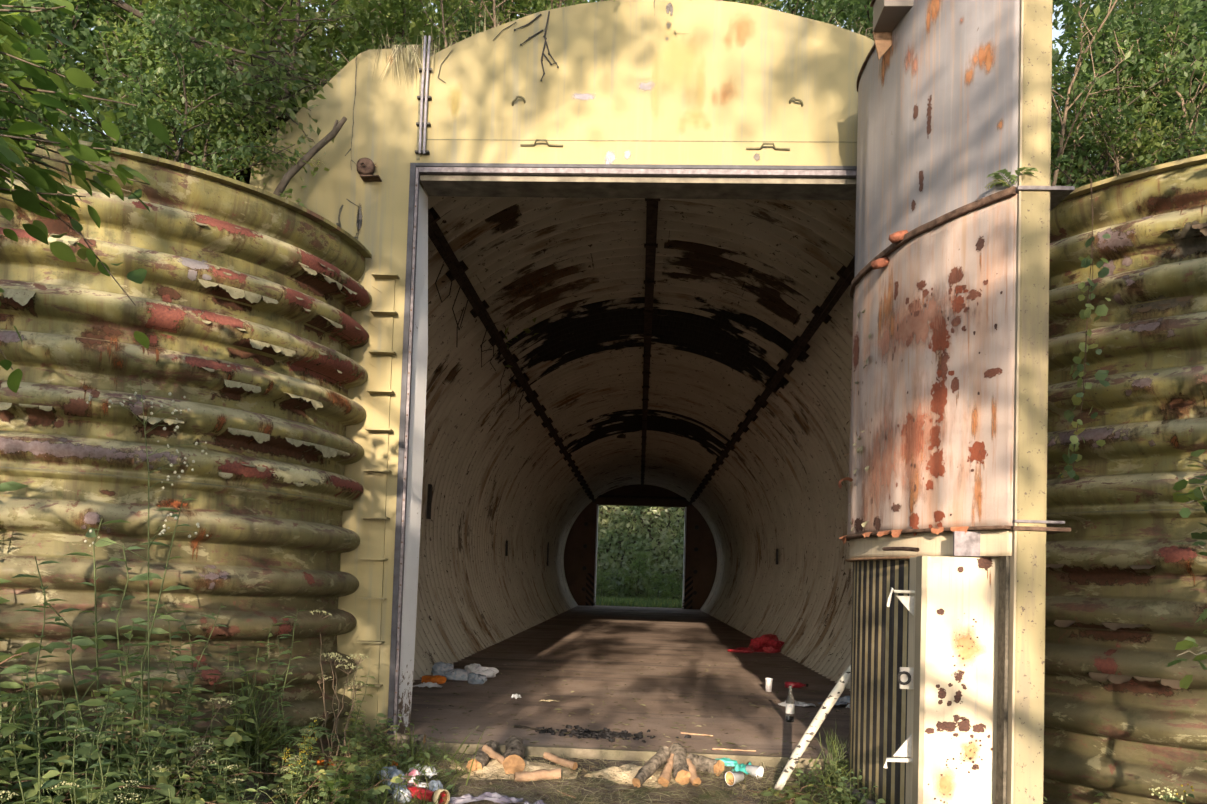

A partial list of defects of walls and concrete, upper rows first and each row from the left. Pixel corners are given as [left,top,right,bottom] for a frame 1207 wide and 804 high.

rust [881,46,917,83]
rust [965,43,994,83]
peeling [48,233,79,246]
peeling [1157,220,1207,265]
peeling [177,257,278,312]
peeling [291,266,357,300]
peeling [227,337,296,367]
rust [984,368,1002,379]
rust [838,266,996,536]
peeling [0,392,350,487]
rust [977,557,993,585]
rust [925,613,993,804]